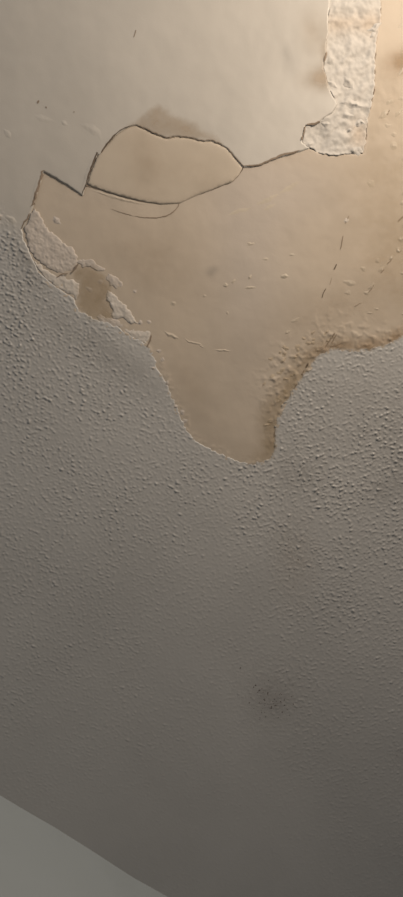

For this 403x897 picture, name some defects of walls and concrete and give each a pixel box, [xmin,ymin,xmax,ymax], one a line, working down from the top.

crack [21,169,45,229]
crack [81,124,299,218]
peeling [0,0,403,465]